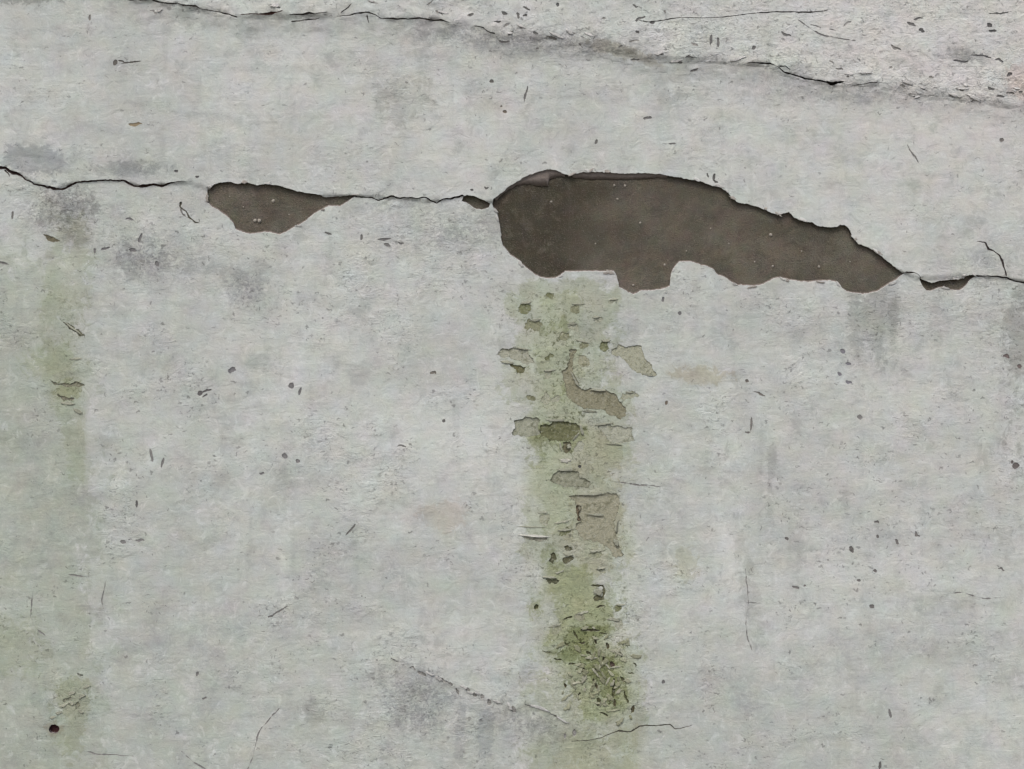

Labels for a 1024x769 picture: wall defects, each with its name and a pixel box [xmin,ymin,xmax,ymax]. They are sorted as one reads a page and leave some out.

crack [129,0,448,23]
crack [639,10,856,41]
crack [748,62,877,86]
crack [0,166,199,223]
spalling [195,176,359,235]
crack [355,194,464,204]
spalling [462,168,905,304]
crack [976,241,1024,283]
water stain [531,282,592,313]
water stain [522,335,594,380]
peeling [391,301,657,738]
water stain [349,408,669,769]